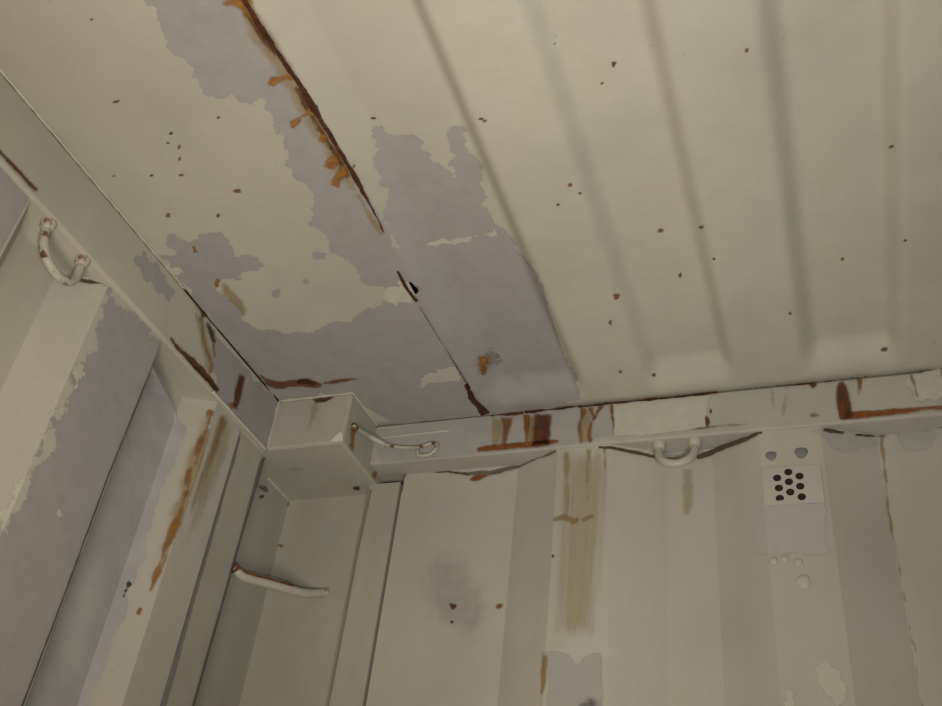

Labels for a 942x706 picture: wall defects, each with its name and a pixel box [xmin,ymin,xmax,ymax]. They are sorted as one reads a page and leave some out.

rust [224,0,384,233]
peeling [134,0,711,462]
rust [170,305,219,392]
rust [229,376,244,409]
rust [260,375,352,403]
rust [383,271,434,331]
rust [448,352,718,451]
rust [779,370,942,419]
peeling [0,284,186,706]
rust [163,410,225,552]